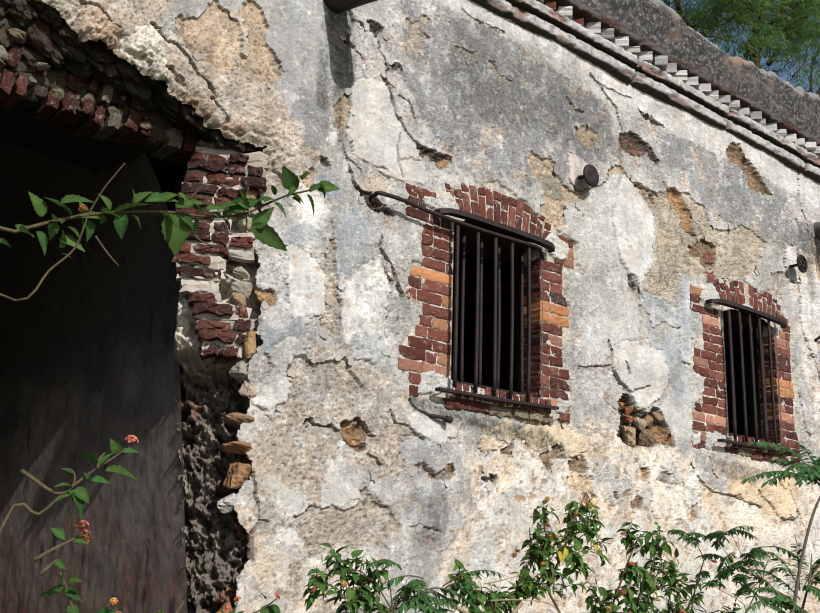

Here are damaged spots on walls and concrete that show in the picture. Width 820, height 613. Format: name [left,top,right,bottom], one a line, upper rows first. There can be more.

spalling [175,0,289,88]
crack [343,10,452,190]
spalling [566,96,601,149]
spalling [618,130,661,166]
spalling [638,103,665,129]
spalling [527,141,820,371]
spalling [611,393,676,451]
spalling [293,400,463,568]
crack [696,456,807,535]